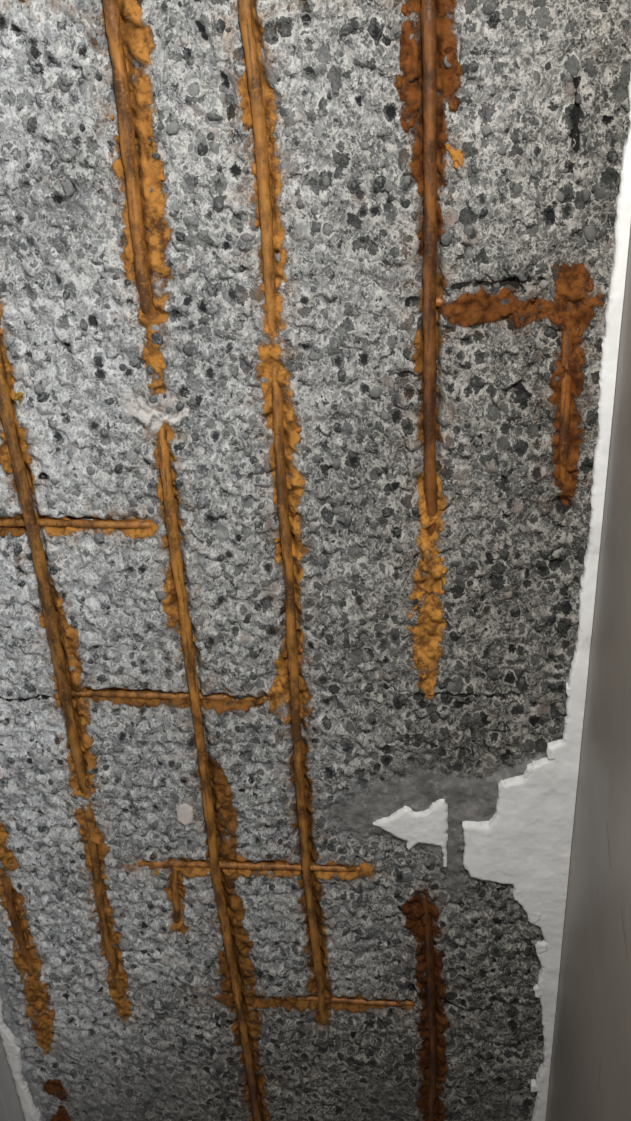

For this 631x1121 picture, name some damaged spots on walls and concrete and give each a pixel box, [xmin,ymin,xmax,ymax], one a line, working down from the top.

rust [394,0,465,254]
spalling [0,463,22,518]
rust [0,303,36,495]
rust [0,420,183,548]
rust [39,0,450,1121]
rust [412,263,604,506]
peeling [460,73,631,1121]
rust [0,822,55,1054]
spalling [0,531,254,1121]
spalling [231,870,315,1000]
peeling [373,799,448,867]